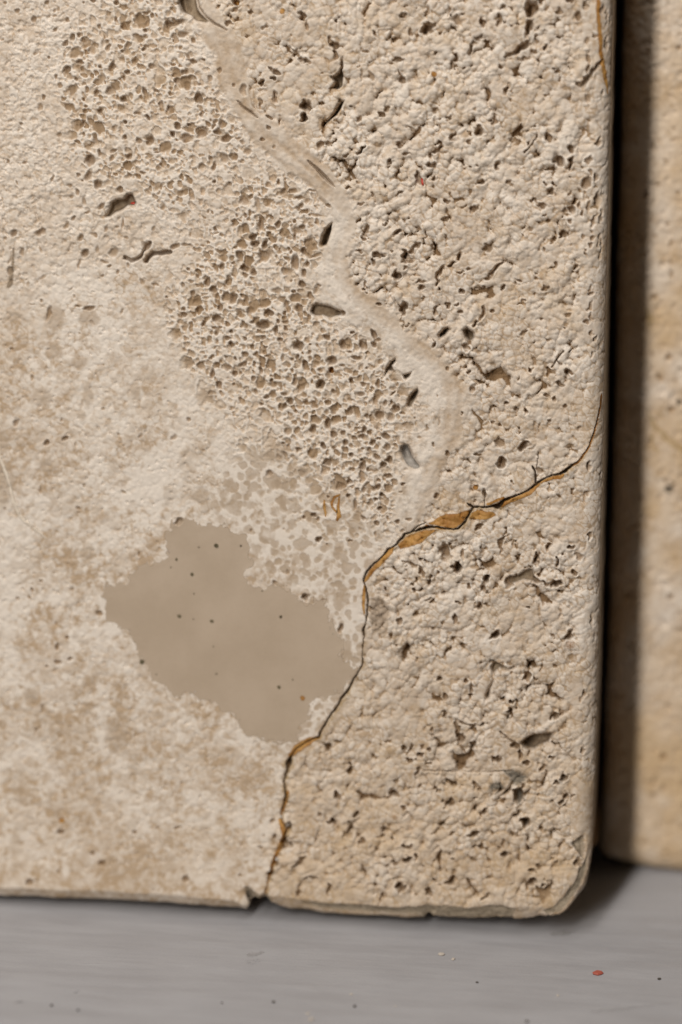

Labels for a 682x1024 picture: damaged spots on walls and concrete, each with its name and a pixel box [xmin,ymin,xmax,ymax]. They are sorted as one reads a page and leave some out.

crack [264,394,602,895]